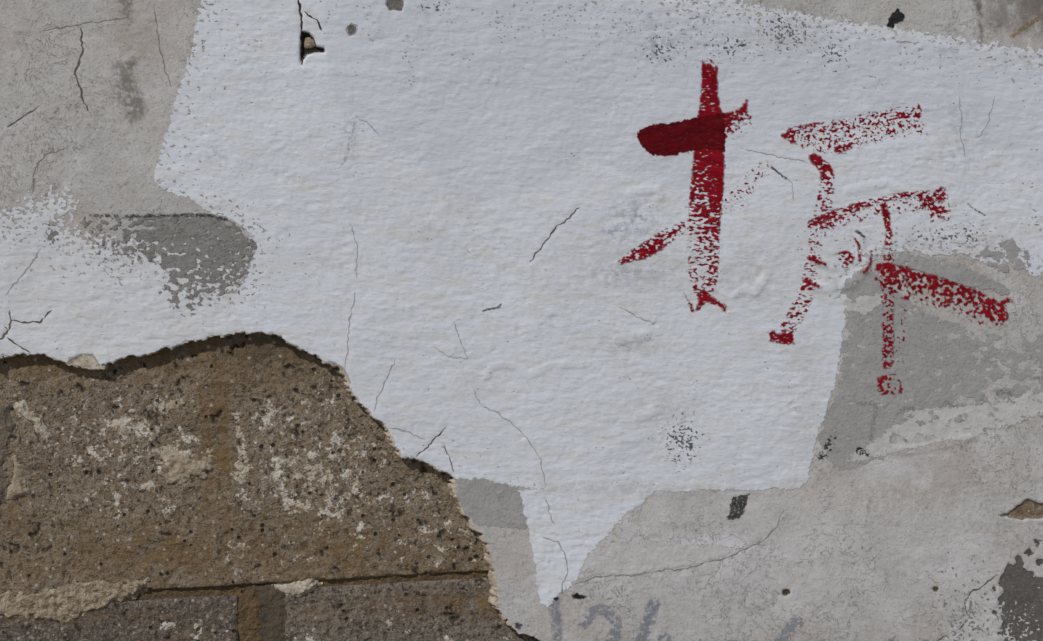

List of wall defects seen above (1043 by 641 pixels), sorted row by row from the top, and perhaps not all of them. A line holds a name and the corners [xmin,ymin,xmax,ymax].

crack [42,17,126,111]
crack [154,10,170,83]
crack [297,0,322,65]
crack [0,252,50,353]
flaking render [892,218,1032,295]
flaking render [817,268,1043,471]
spalling [0,331,541,641]
peeling [662,412,705,472]
spalling [1000,498,1043,520]
flaking render [919,539,1043,641]